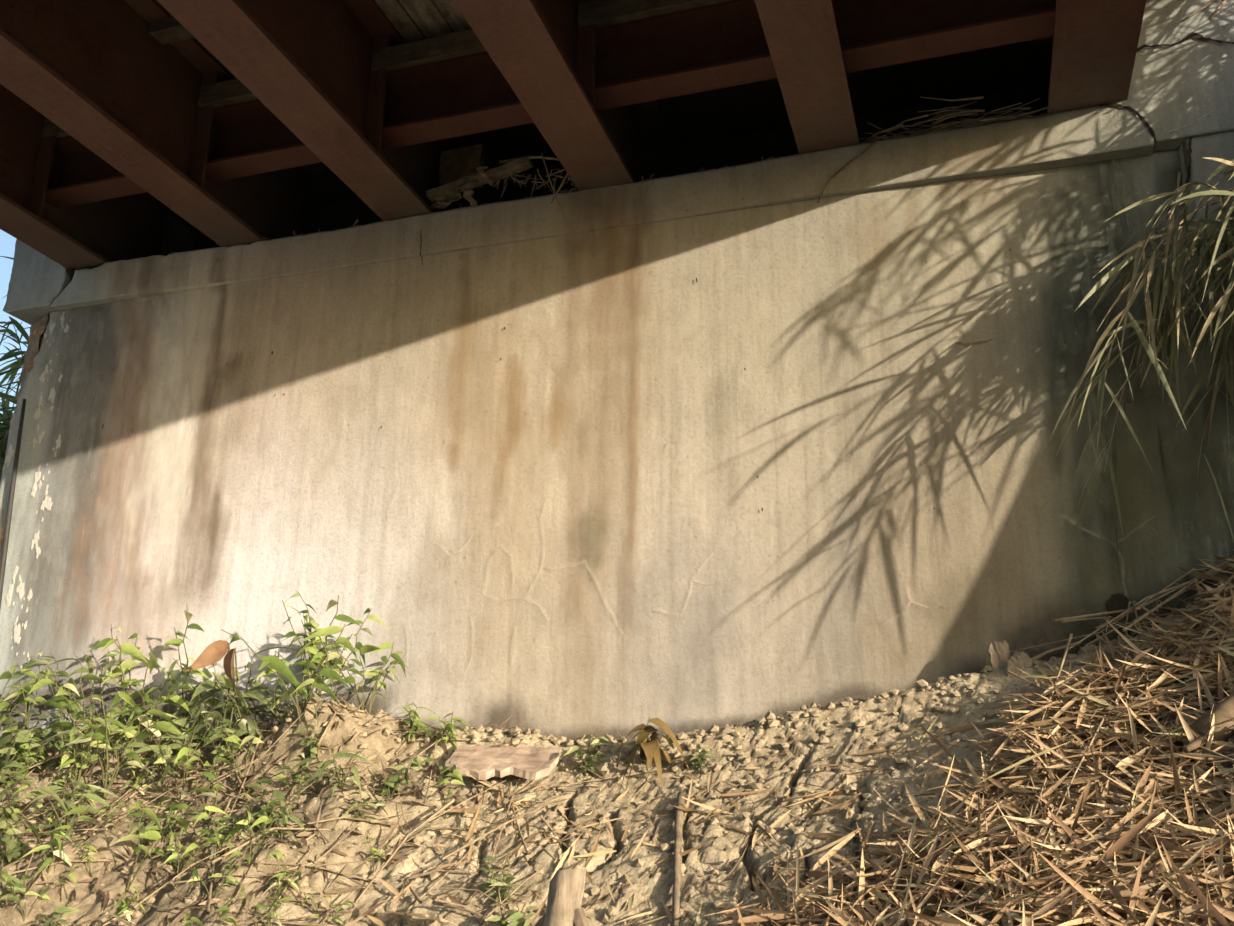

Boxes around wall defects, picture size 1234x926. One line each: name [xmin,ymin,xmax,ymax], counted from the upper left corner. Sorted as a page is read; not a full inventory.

crack [1137,32,1234,51]
crack [1099,103,1155,137]
peeling [5,444,15,467]
peeling [16,311,71,558]
corrosion [98,332,147,539]
peeling [5,566,33,673]
damp [1013,598,1125,663]